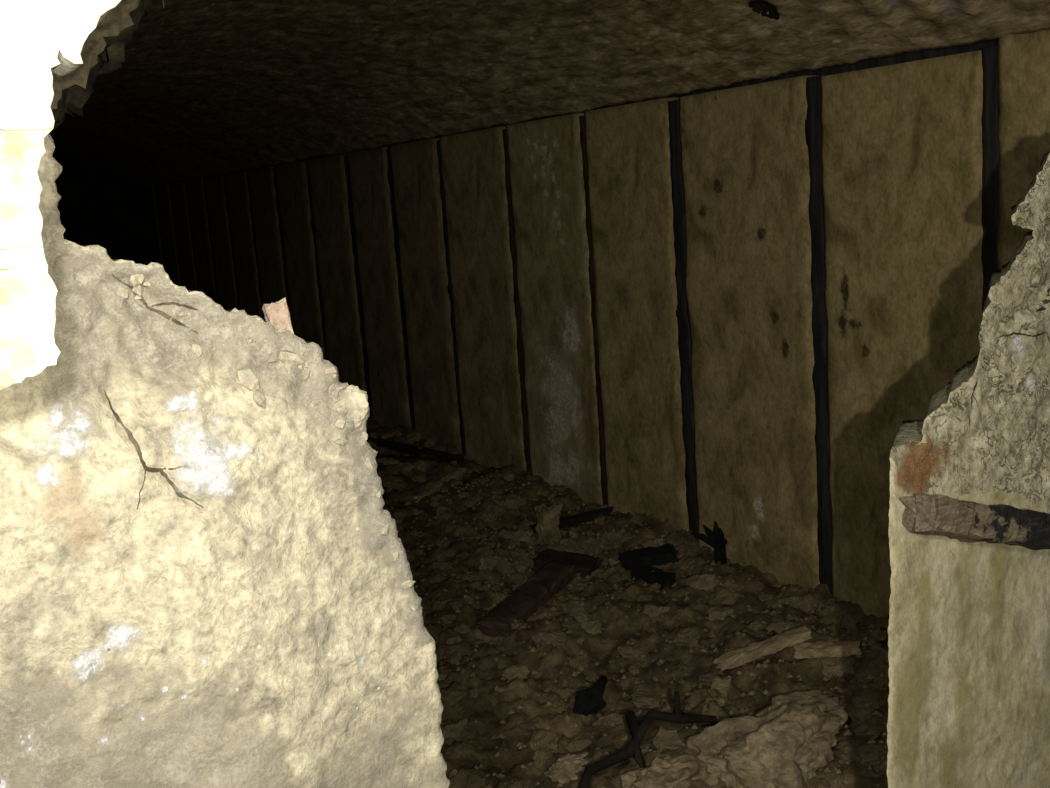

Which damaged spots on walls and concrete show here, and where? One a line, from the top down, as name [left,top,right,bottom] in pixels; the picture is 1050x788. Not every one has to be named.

spalling [45,135,55,154]
spalling [894,169,1050,514]
crack [998,288,1050,341]
leakage [35,409,89,485]
crack [103,389,203,510]
leakage [169,391,253,496]
spalling [41,212,433,645]
corrosion [897,437,947,494]
leakage [0,625,285,788]